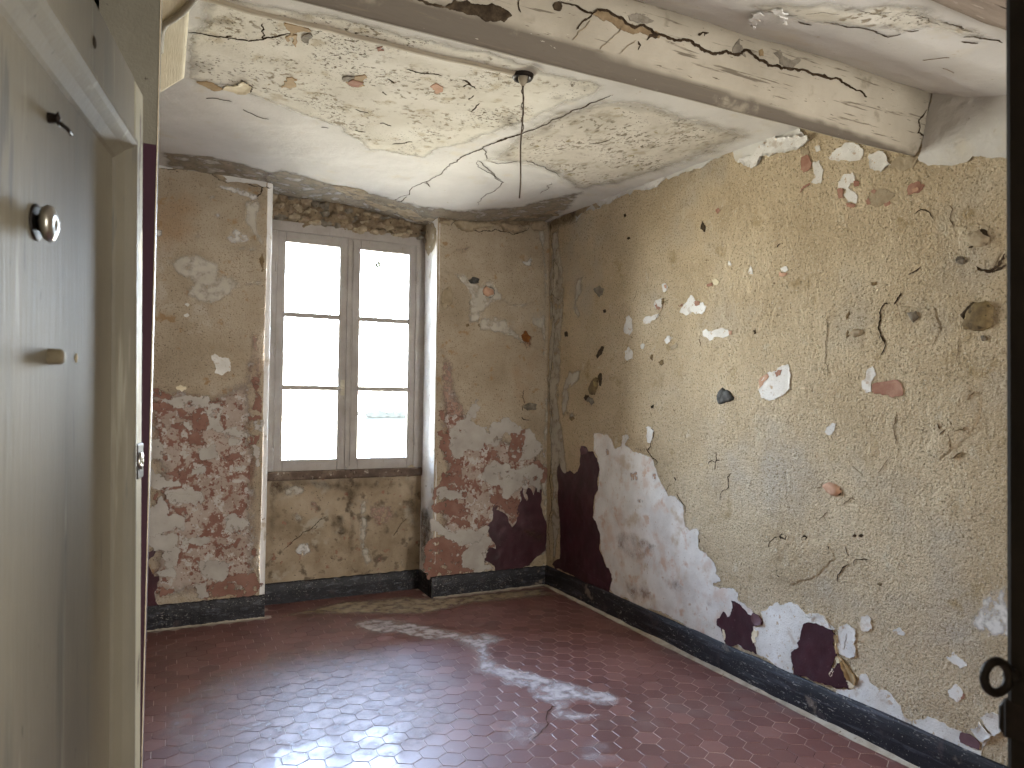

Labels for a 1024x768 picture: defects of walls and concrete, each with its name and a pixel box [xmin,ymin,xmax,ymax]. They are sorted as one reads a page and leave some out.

crack [188,24,290,42]
crack [395,95,613,205]
peeling [190,0,1006,256]
crack [560,1,867,97]
peeling [147,336,264,606]
water stain [164,153,582,566]
peeling [423,363,1000,755]